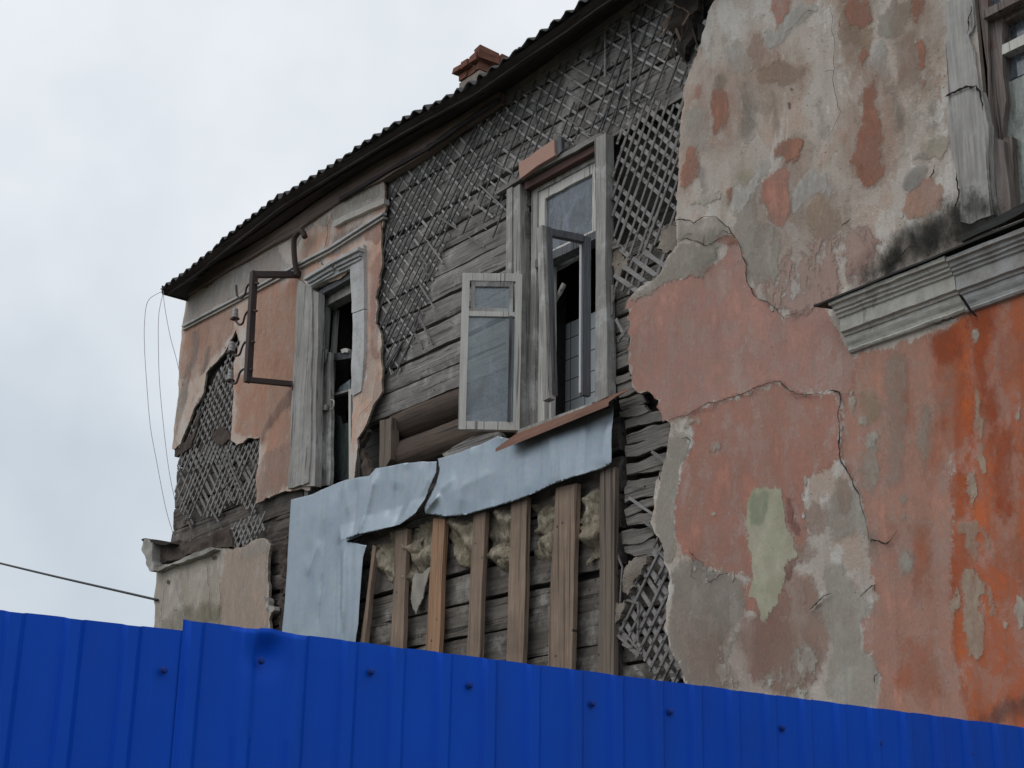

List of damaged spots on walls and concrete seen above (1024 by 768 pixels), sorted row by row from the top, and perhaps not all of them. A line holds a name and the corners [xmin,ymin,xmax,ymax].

peeling [838,0,924,67]
peeling [289,182,384,243]
crack [676,216,800,318]
peeling [726,136,834,227]
peeling [849,75,885,186]
peeling [900,135,949,220]
damp [869,192,997,282]
peeling [234,279,297,503]
crack [668,379,897,544]
peeling [625,225,996,720]
rust [934,294,1024,728]
peeling [212,541,280,629]